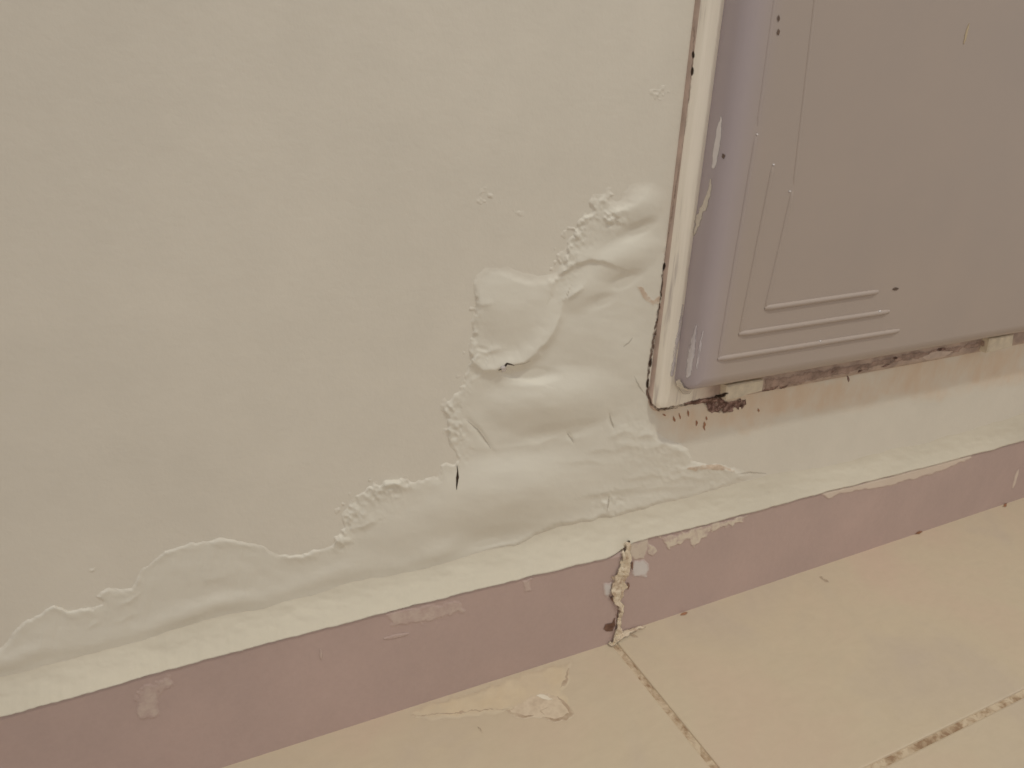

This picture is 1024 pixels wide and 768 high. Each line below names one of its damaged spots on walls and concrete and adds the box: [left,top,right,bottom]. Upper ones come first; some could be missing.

peeling [334,162,753,588]
peeling [820,455,973,499]
crack [609,541,633,646]